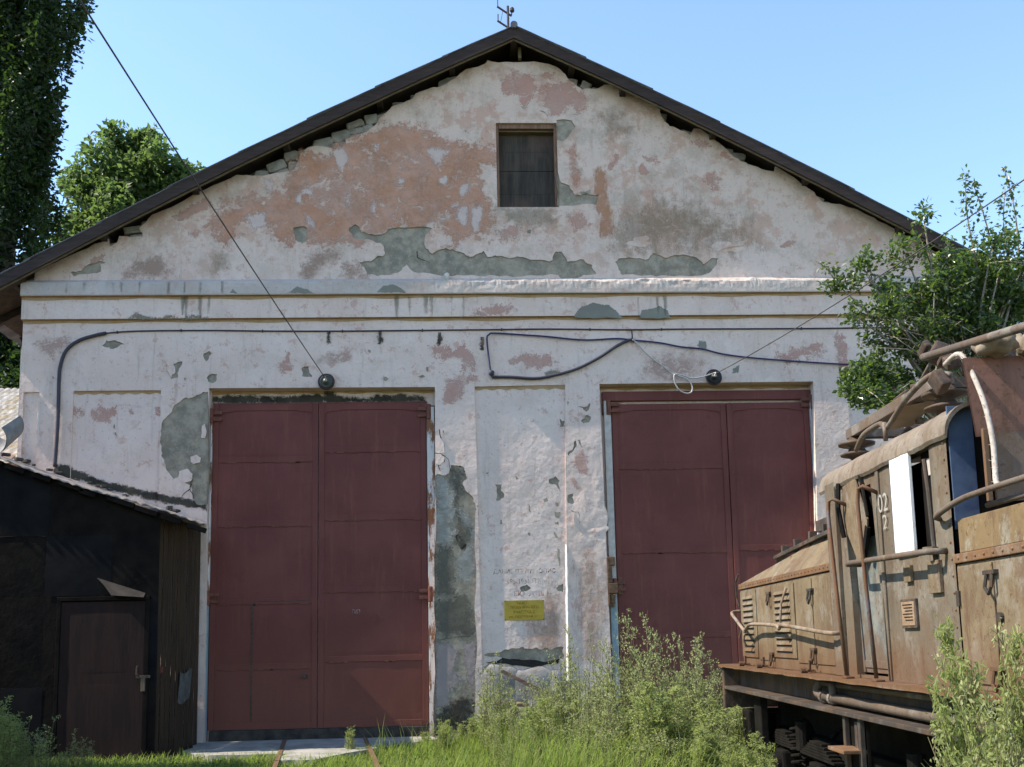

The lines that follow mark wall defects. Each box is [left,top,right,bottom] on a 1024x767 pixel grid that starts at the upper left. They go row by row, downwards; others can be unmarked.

peeling [502,70,599,233]
peeling [172,122,596,293]
spalling [71,254,105,276]
spalling [616,245,747,277]
spalling [575,302,623,319]
spalling [640,306,671,319]
peeling [419,343,477,405]
leakage [55,464,208,511]
spalling [156,374,217,505]
peeling [568,440,588,475]
spalling [543,476,578,566]
spalling [433,465,564,735]